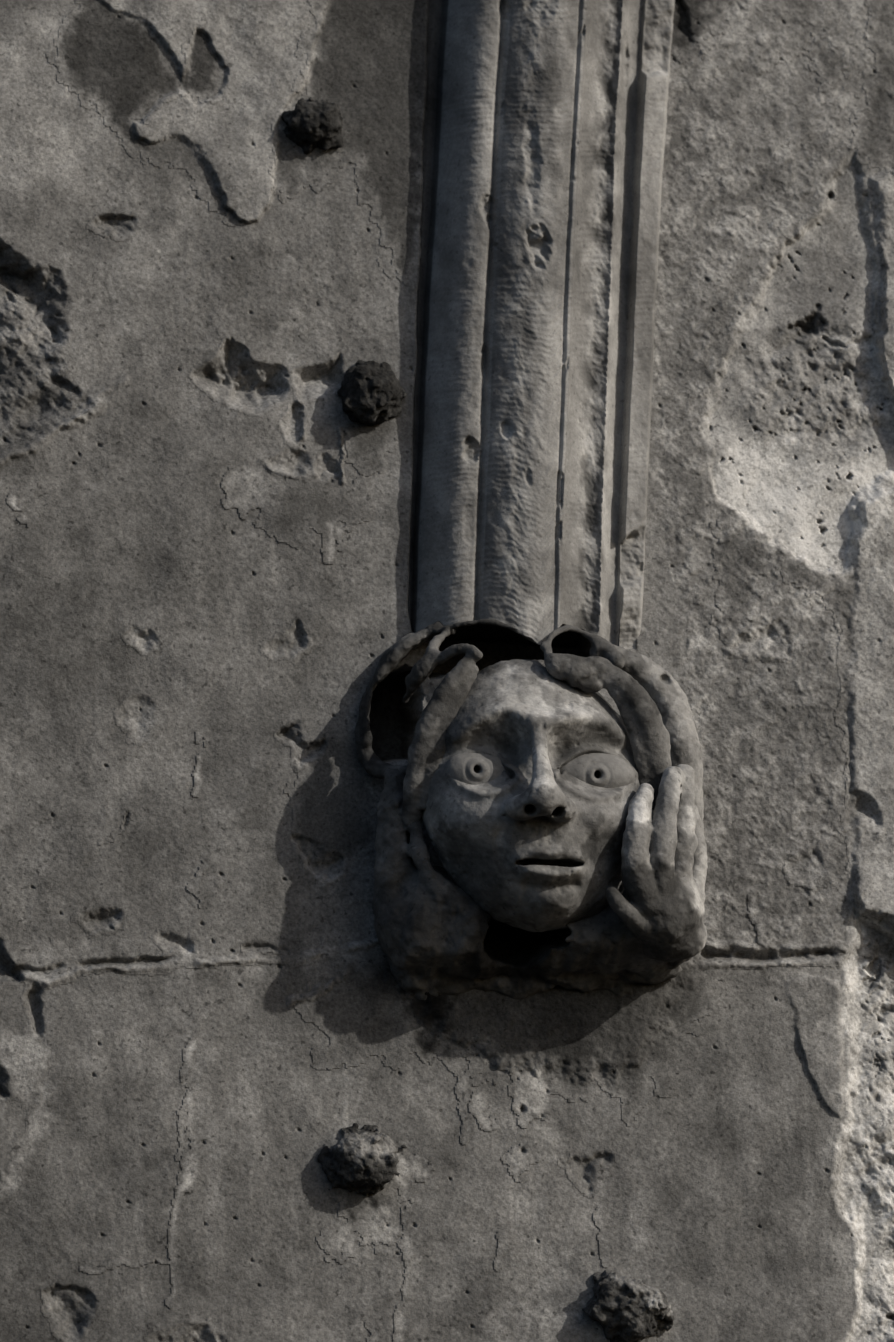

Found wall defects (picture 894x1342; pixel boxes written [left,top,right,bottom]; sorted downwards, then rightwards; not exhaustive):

flaking render [113,0,317,225]
spalling [0,235,131,470]
peeling [189,337,346,480]
spalling [686,140,894,1342]
crack [11,938,377,1009]